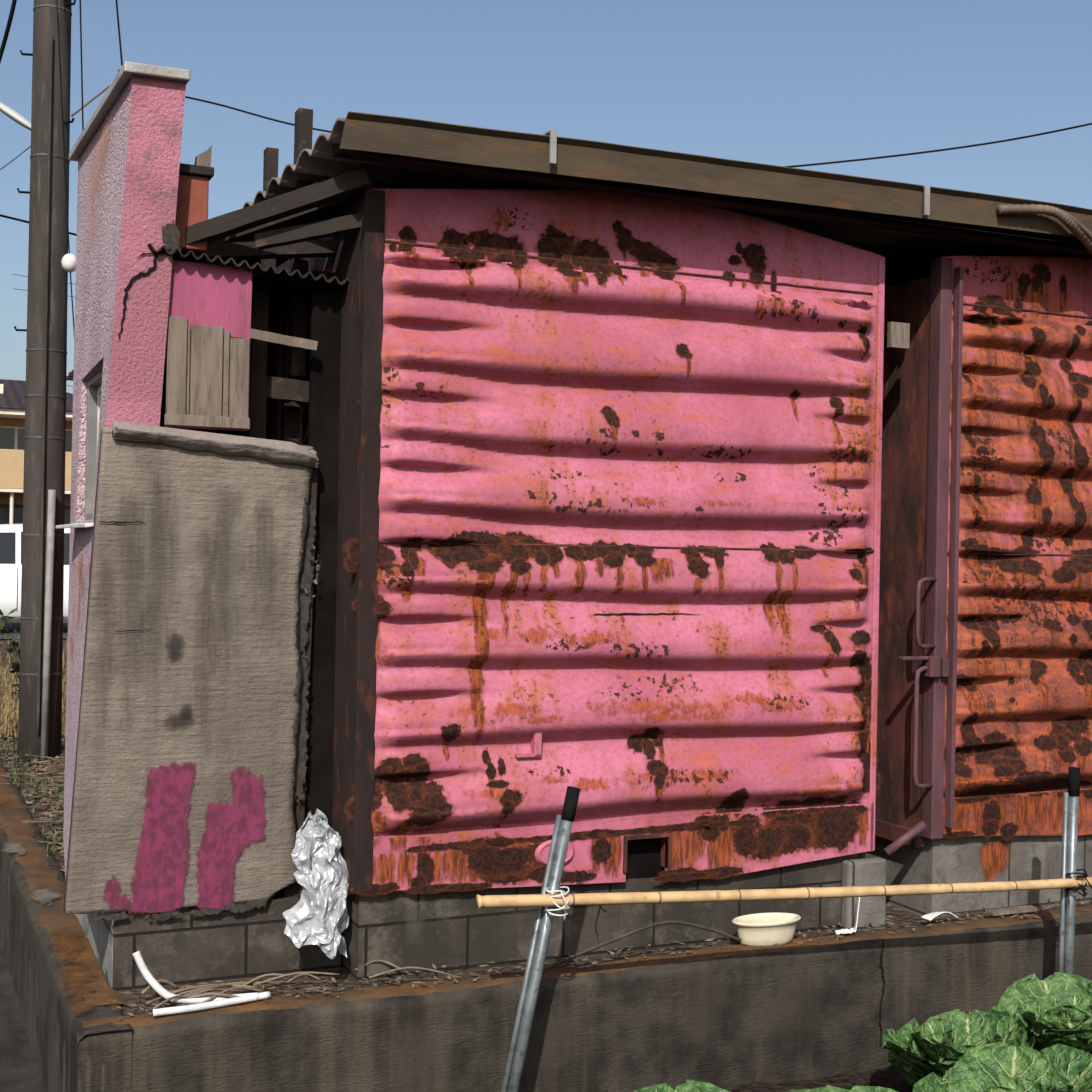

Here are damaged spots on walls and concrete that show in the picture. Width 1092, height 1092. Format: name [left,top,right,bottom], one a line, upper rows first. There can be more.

crack [118,248,171,339]
rust [389,226,419,260]
rust [437,206,686,304]
rust [722,241,815,319]
rust [759,542,817,633]
rust [844,547,873,609]
rust [942,256,1092,882]
water stain [169,634,182,660]
water stain [167,706,191,727]
rust [351,530,729,895]
rust [561,623,879,883]